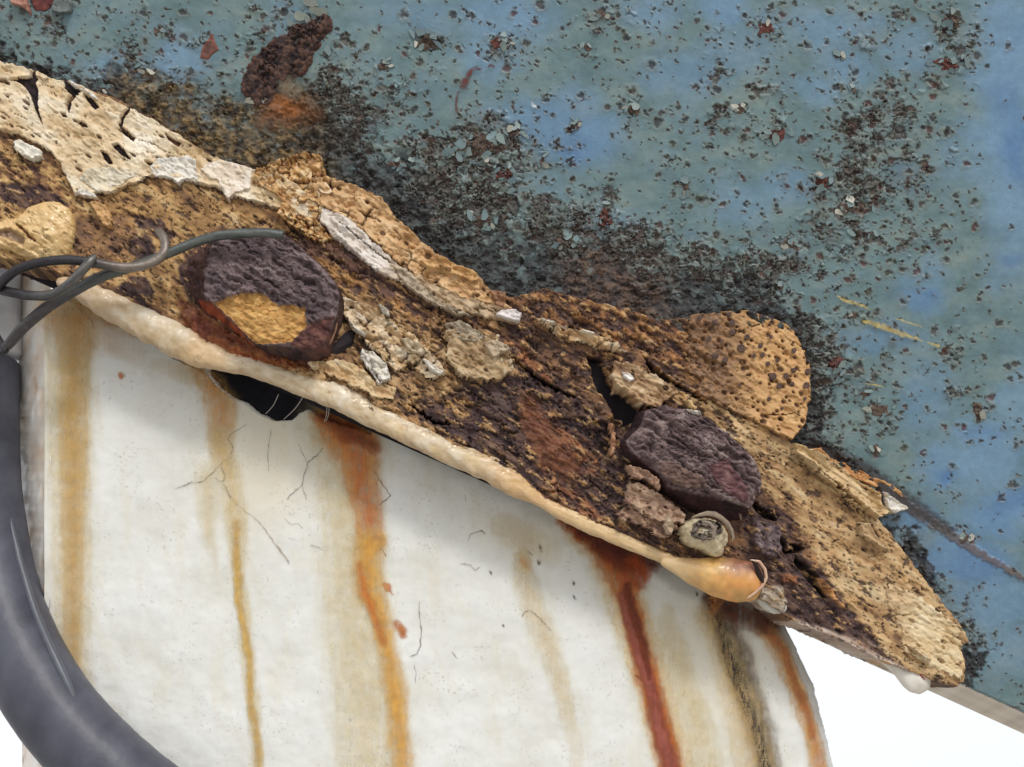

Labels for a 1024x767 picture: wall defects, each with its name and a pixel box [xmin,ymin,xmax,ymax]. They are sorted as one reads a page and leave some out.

crack [14,68,99,121]
crack [120,107,134,141]
rust [200,34,218,60]
rust [241,0,333,124]
peeling [753,19,782,38]
peeling [925,54,970,74]
peeling [0,61,908,552]
crack [178,424,271,497]
rust [234,529,262,763]
rust [314,410,410,767]
rust [558,519,683,767]
peeling [884,584,964,680]